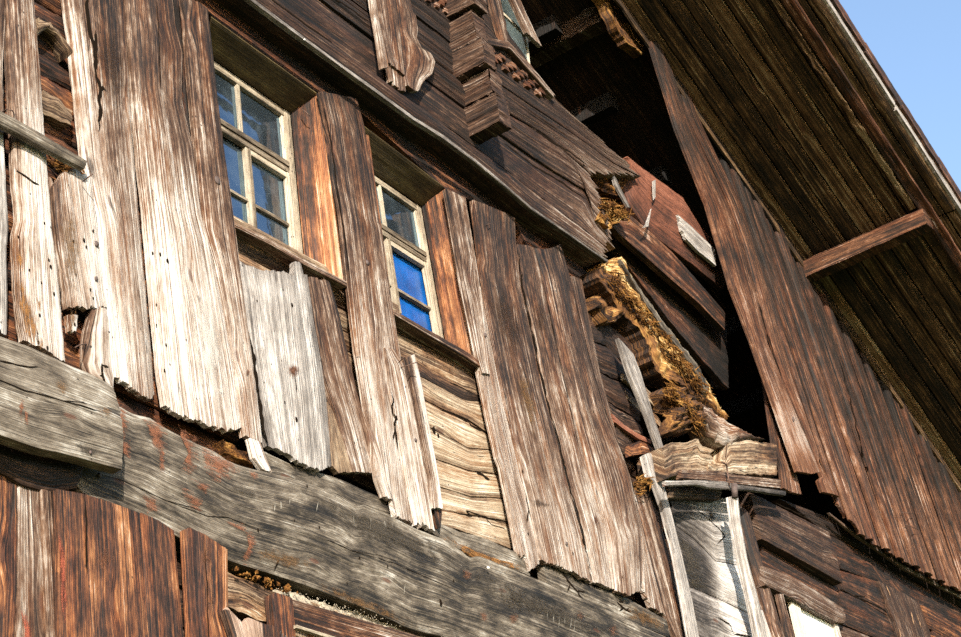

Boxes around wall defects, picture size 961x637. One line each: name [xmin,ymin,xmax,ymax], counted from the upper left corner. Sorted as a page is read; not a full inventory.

crack [85,0,106,130]
crack [390,395,398,448]
corrosion [203,449,232,478]